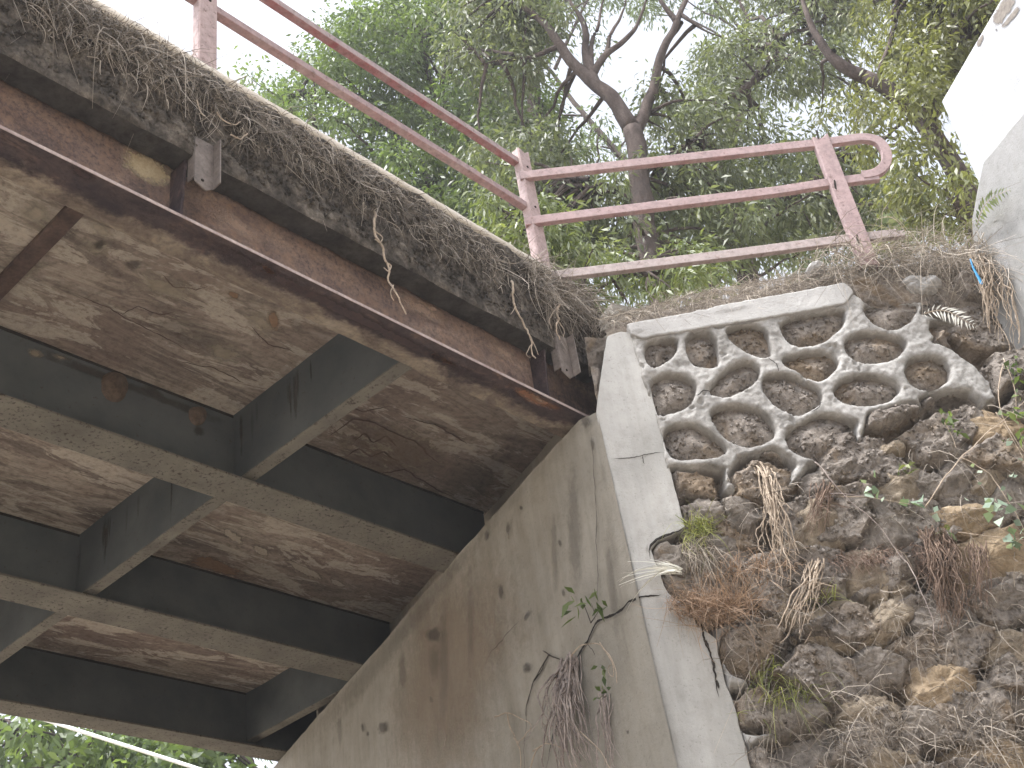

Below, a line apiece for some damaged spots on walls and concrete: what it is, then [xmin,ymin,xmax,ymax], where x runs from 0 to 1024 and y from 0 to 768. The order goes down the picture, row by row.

crack [577,428,660,657]
crack [697,615,720,696]